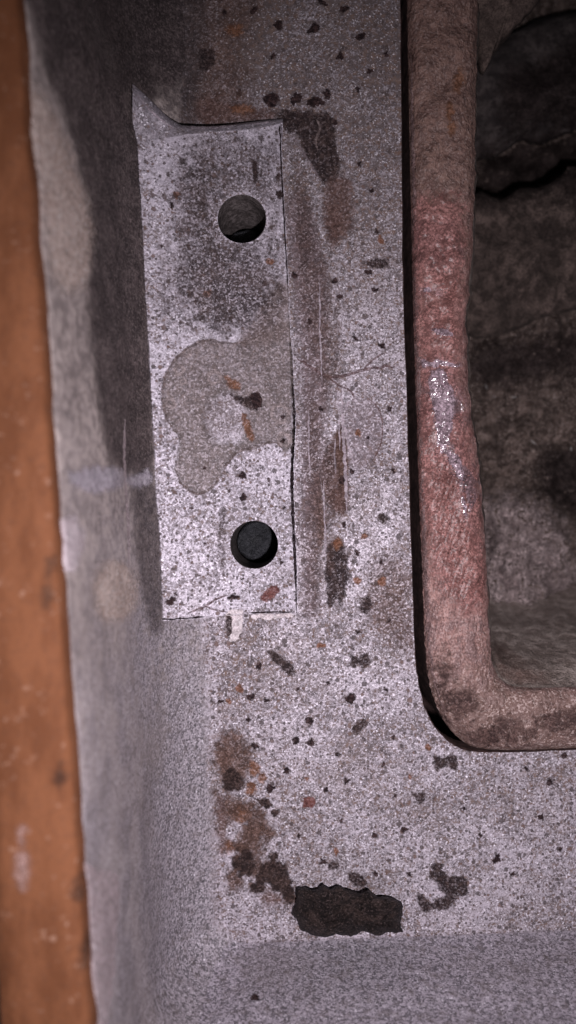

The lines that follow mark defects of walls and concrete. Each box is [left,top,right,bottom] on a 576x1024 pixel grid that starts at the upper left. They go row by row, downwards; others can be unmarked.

corrosion [313,426,361,607]
corrosion [214,730,297,904]